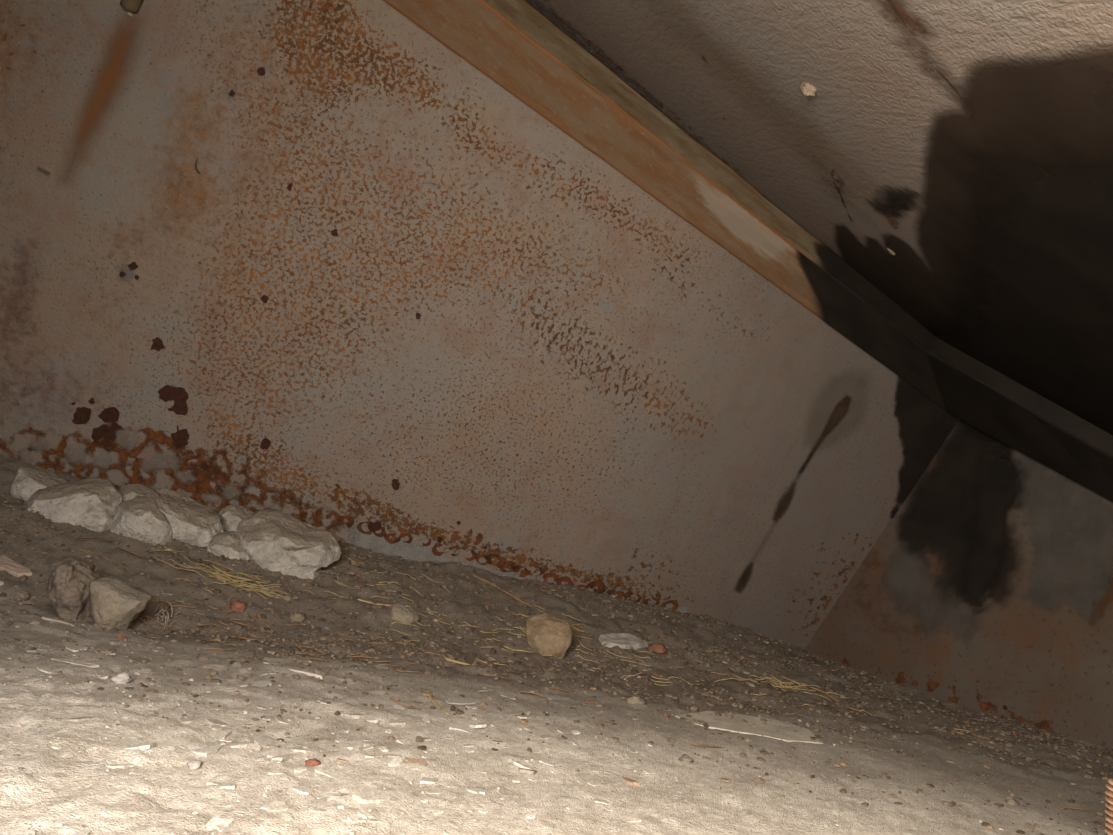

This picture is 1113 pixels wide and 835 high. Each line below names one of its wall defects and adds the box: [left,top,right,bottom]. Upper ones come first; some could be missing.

rust [147,0,770,611]
water stain [798,48,1113,634]
rust [71,398,123,451]
water stain [773,380,862,521]
water stain [736,563,752,592]
rust [770,529,874,636]